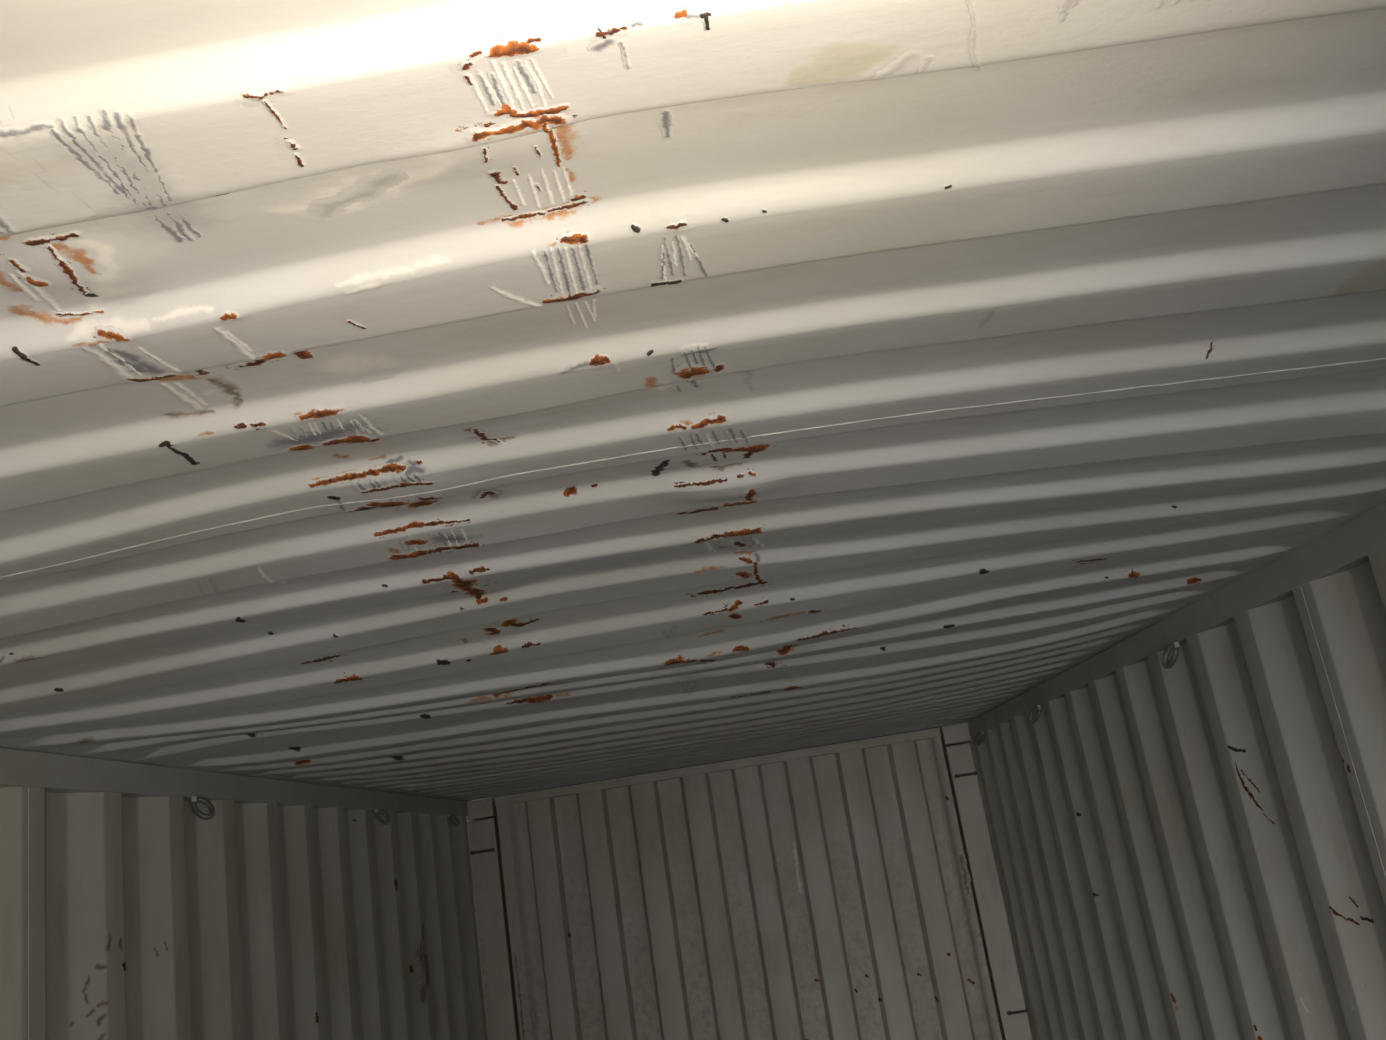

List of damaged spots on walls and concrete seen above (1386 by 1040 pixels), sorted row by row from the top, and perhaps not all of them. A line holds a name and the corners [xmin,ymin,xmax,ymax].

rust [666,0,714,31]
rust [432,6,649,249]
rust [0,224,146,350]
rust [204,301,256,326]
rust [217,341,331,378]
rust [557,341,739,393]
rust [193,390,357,439]
rust [458,426,519,454]
rust [263,433,555,666]
rust [645,405,865,701]
rust [461,668,574,709]